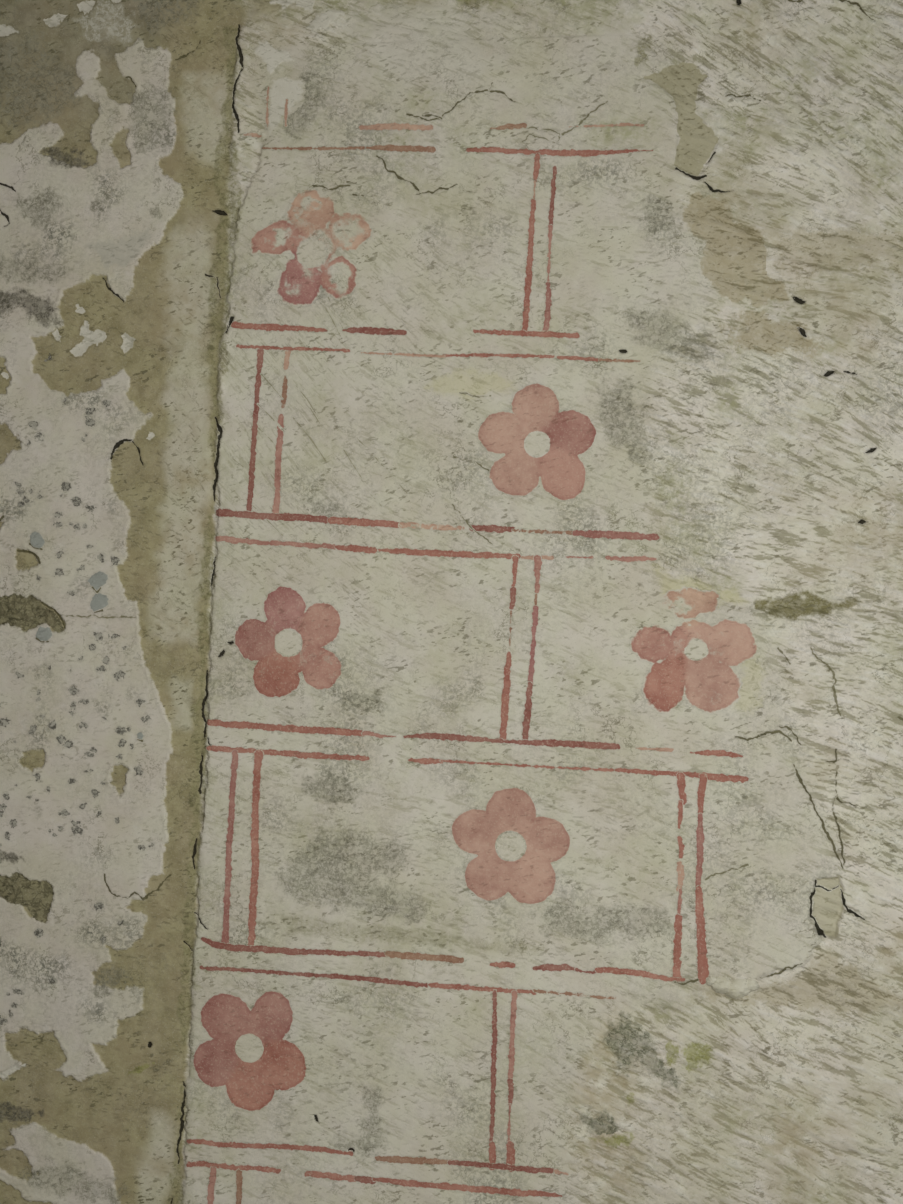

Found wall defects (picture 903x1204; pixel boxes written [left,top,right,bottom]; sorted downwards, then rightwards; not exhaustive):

crack [839,0,877,23]
crack [231,23,244,133]
crack [212,416,223,502]
peeling [0,0,250,1204]
crack [208,556,216,590]
crack [776,645,844,719]
crack [198,670,212,795]
crack [734,725,866,939]
crack [183,912,208,952]
crack [673,978,699,986]
crack [759,963,804,979]
crack [176,1081,186,1164]